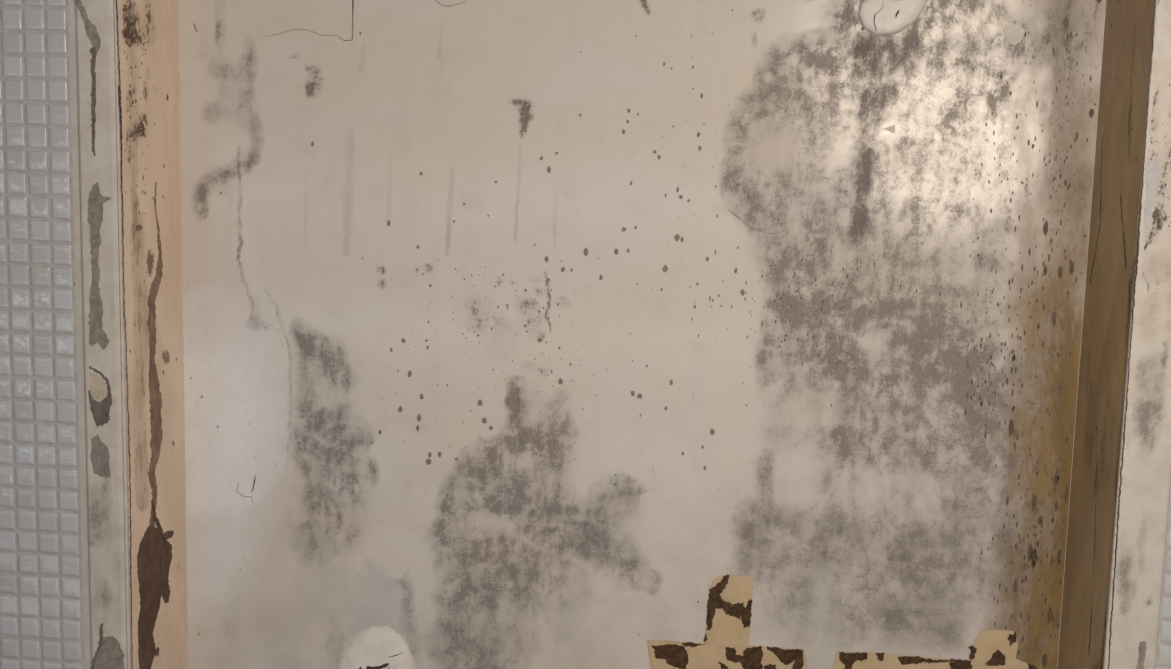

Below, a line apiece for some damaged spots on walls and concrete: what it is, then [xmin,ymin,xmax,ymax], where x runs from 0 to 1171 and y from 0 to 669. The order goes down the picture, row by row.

peeling [75,0,101,156]
crack [264,0,354,41]
leakage [1114,120,1171,249]
peeling [87,183,111,349]
peeling [88,366,112,477]
peeling [133,182,174,669]
leakage [295,331,349,385]
leakage [291,402,382,494]
leakage [426,356,610,669]
leakage [713,0,1130,669]
peeling [91,623,125,669]